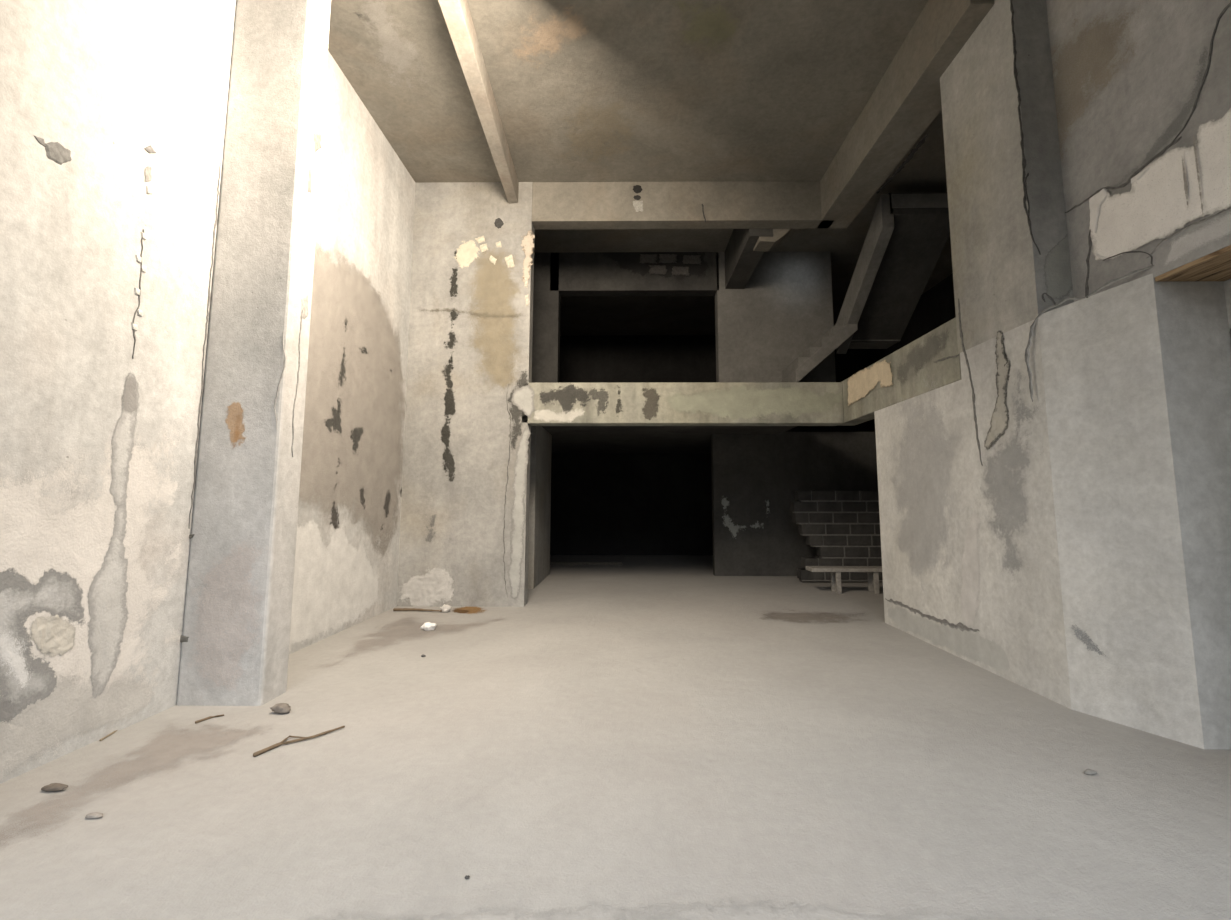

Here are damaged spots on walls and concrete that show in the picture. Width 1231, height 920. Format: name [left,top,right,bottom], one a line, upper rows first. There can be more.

peeling [454,231,535,306]
crack [1010,0,1041,255]
crack [1025,2,1231,402]
spalling [1089,108,1231,260]
corrosion [225,402,245,449]
water stain [298,238,406,562]
water stain [0,373,156,781]
crack [885,598,979,632]